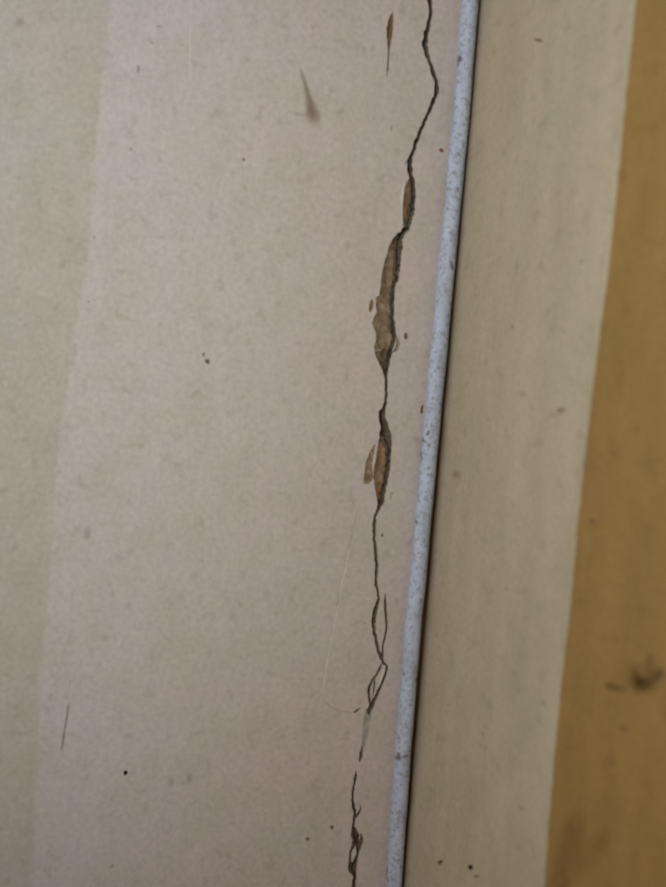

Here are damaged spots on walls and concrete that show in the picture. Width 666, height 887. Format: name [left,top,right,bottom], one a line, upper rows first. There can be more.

flaking render [369,180,410,374]
flaking render [363,439,393,503]
crack [323,0,439,887]